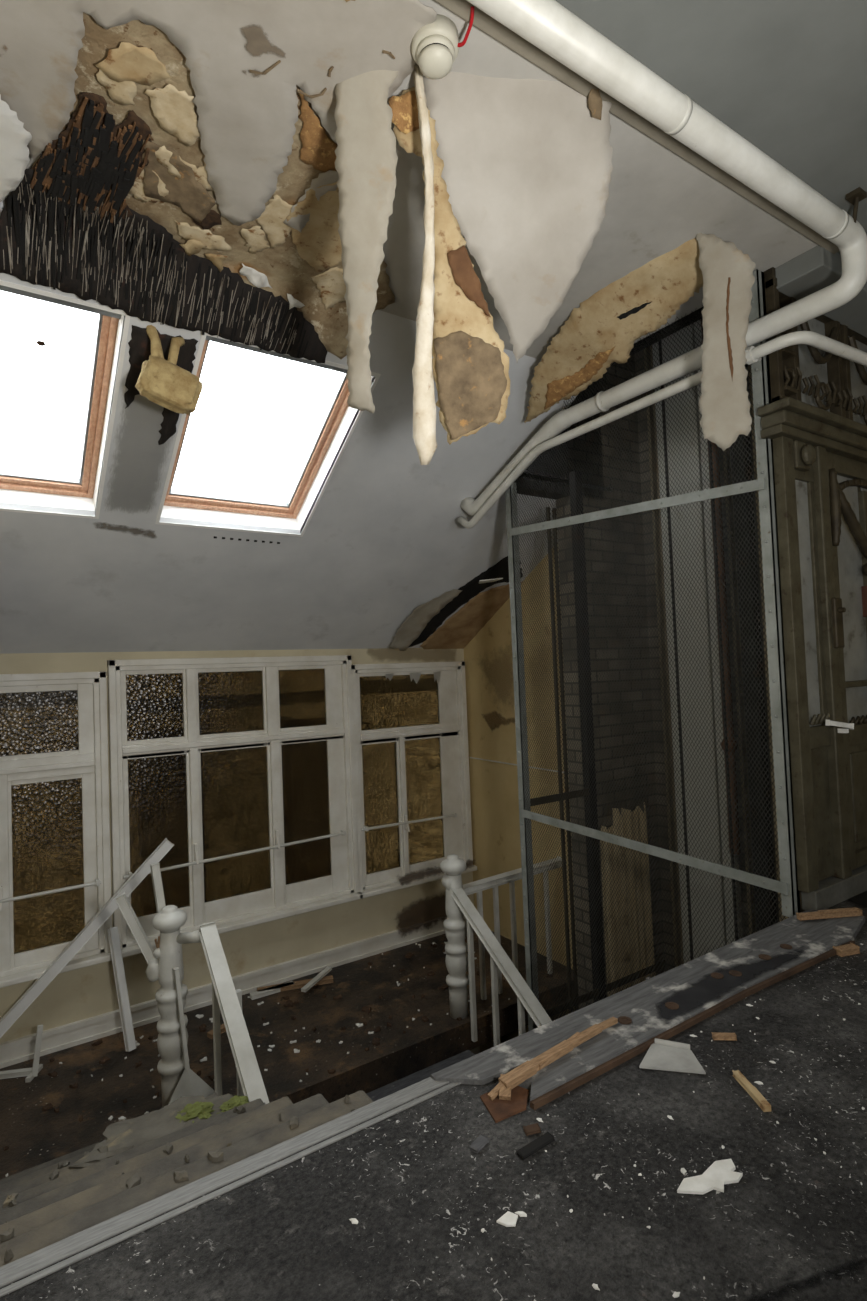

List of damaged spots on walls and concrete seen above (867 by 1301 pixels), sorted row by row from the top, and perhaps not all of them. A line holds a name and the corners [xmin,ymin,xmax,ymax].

peeling [58,12,348,359]
peeling [372,259,395,315]